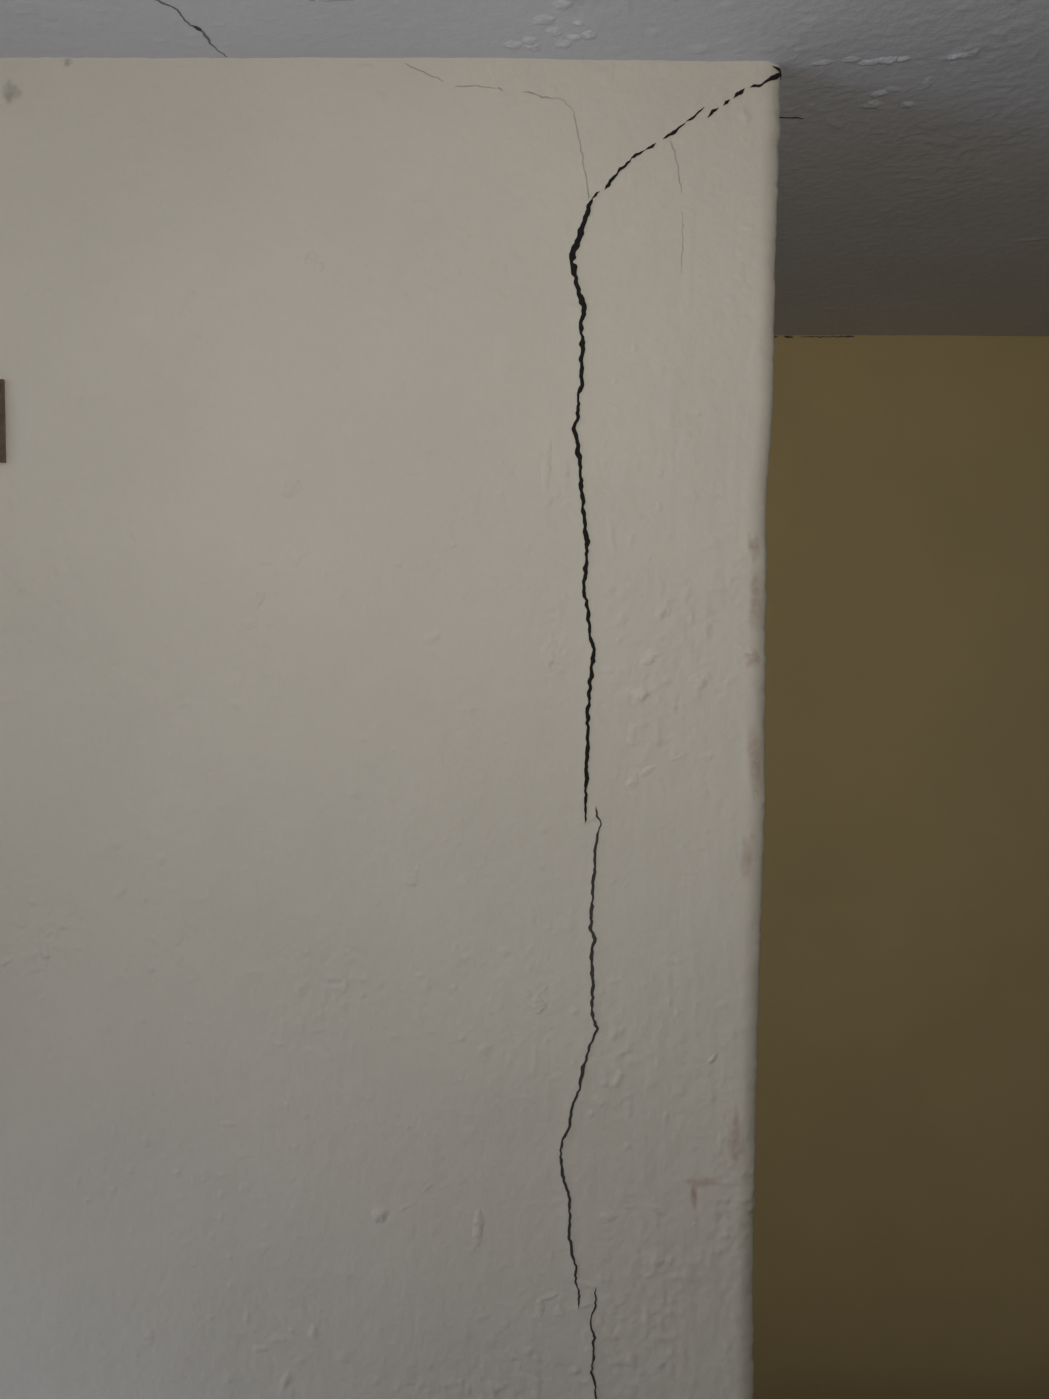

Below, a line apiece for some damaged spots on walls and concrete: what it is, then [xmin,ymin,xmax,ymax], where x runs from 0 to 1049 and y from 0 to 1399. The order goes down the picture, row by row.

crack [156,0,227,57]
crack [405,63,782,1399]